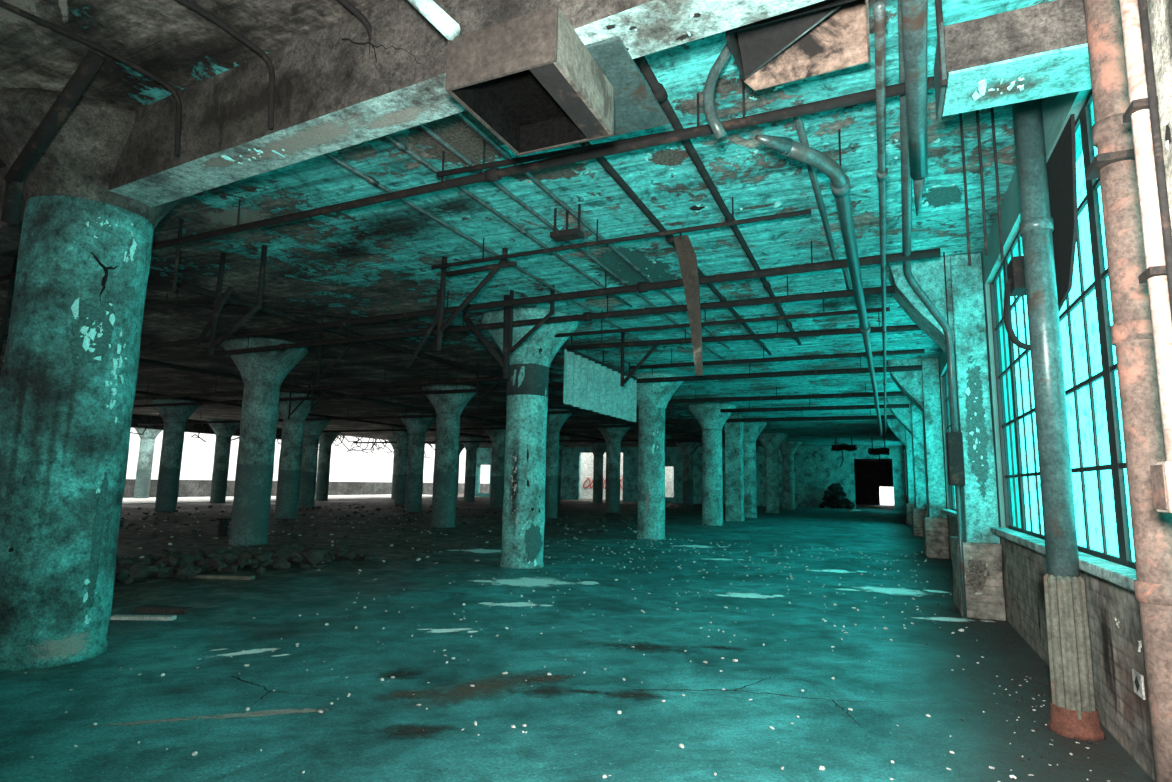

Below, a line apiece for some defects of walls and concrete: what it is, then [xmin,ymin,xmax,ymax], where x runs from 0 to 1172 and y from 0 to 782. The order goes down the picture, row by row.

crack [89,252,119,302]
peeling [70,298,127,423]